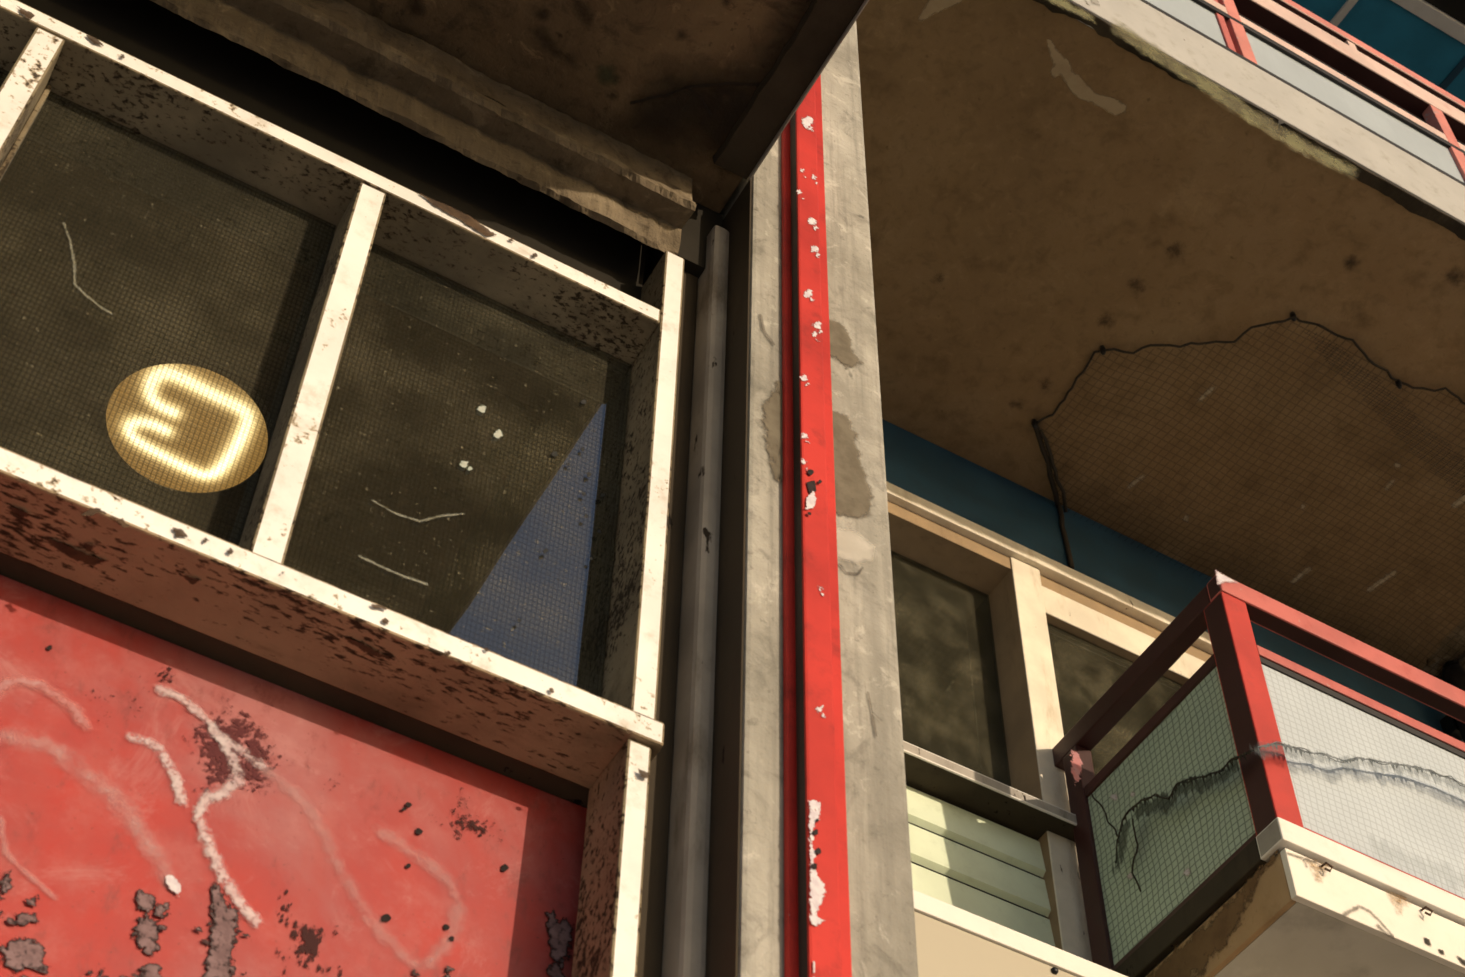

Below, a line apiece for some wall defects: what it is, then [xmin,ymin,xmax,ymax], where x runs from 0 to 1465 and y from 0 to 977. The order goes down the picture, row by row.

peeling [1215,570,1238,586]
spalling [1421,619,1465,681]
peeling [808,799,826,926]
peeling [0,870,49,977]
peeling [87,875,181,977]
peeling [194,882,252,977]
peeling [276,889,342,977]